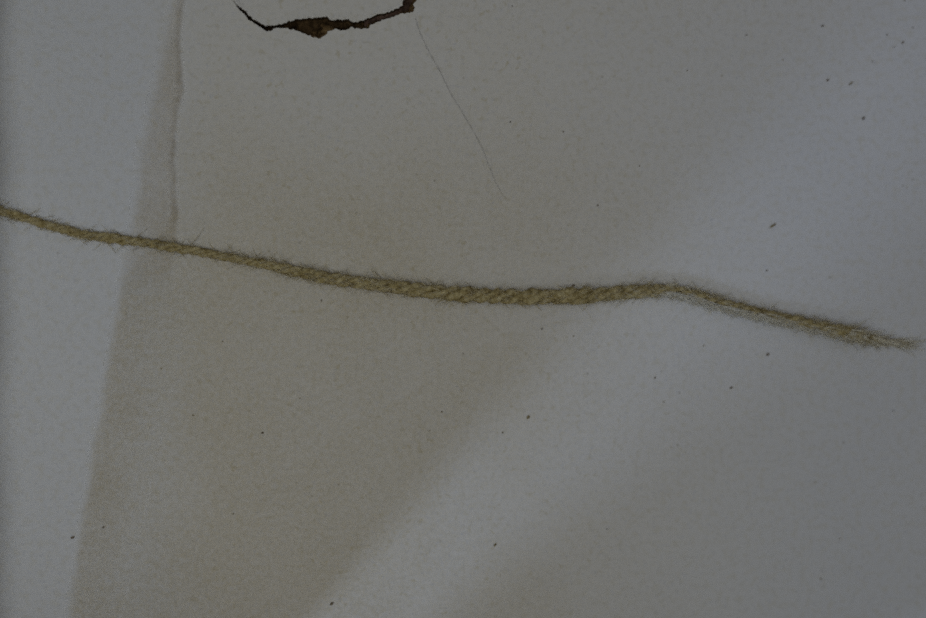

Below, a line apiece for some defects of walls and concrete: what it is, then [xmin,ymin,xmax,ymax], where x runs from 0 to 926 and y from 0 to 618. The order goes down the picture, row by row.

crack [224,0,508,198]